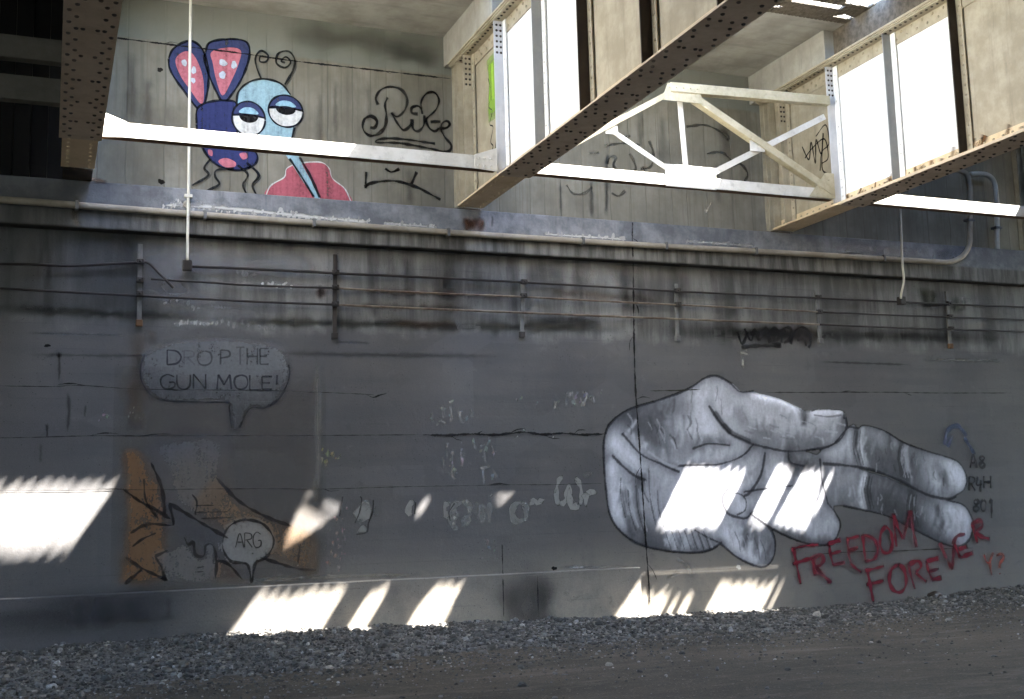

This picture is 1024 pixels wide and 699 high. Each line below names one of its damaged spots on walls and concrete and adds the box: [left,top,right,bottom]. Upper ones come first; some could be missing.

rust [465,219,485,231]
damp [268,319,586,331]
crack [2,431,359,439]
crack [394,428,607,440]